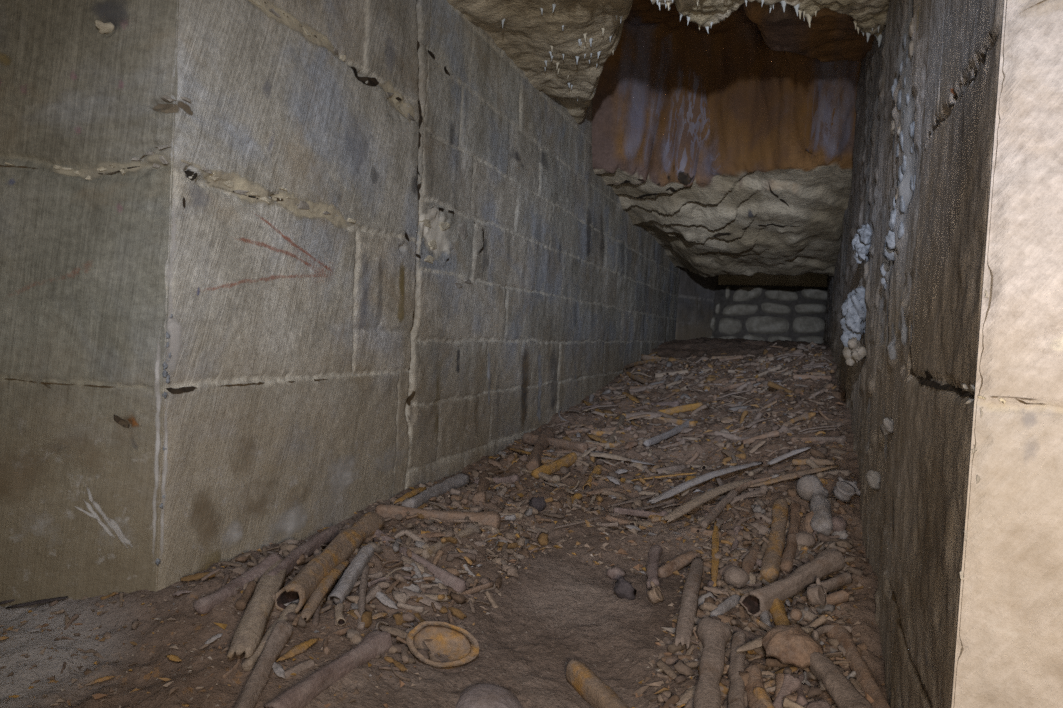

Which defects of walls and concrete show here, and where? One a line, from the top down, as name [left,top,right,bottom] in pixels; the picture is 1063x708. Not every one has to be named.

crack [922,32,992,142]
crack [0,162,144,180]
water stain [851,0,919,359]
water stain [840,286,867,367]